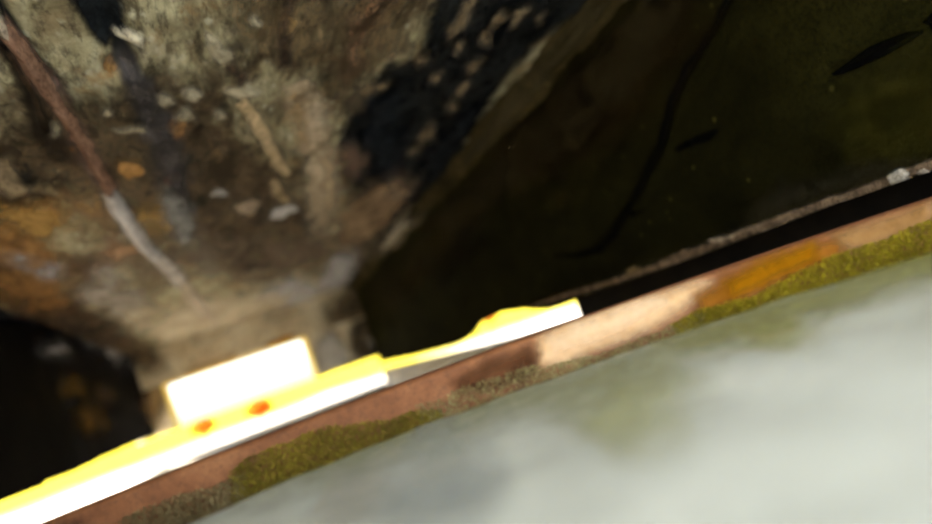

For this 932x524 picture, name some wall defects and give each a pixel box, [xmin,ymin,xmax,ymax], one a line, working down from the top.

crack [833,14,932,76]
corrosion [0,23,144,313]
damp [0,0,686,375]
corrosion [696,240,844,313]
corrosion [266,334,295,347]
damp [457,348,537,393]